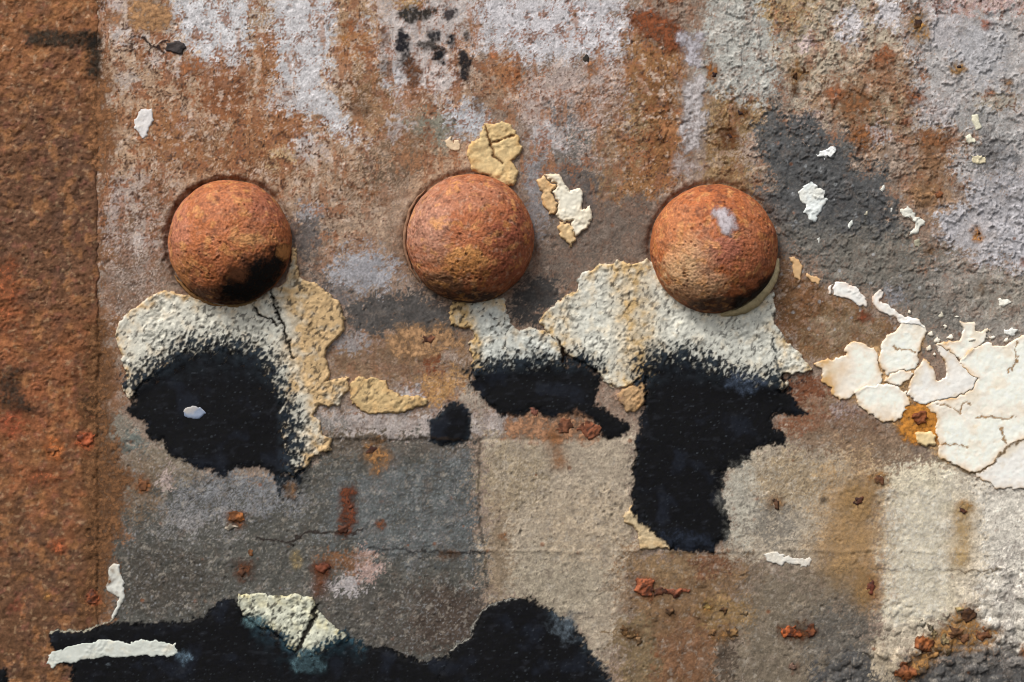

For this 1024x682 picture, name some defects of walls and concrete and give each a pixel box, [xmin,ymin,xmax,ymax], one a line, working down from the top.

corrosion [628,0,682,53]
corrosion [581,54,599,77]
corrosion [84,78,117,171]
peeling [445,121,523,186]
corrosion [403,189,426,282]
peeling [536,173,593,247]
corrosion [174,275,221,306]
crack [254,292,294,359]
peeling [449,257,1024,490]
corrosion [338,487,357,535]
corrosion [634,574,691,616]
corrosion [894,606,998,682]